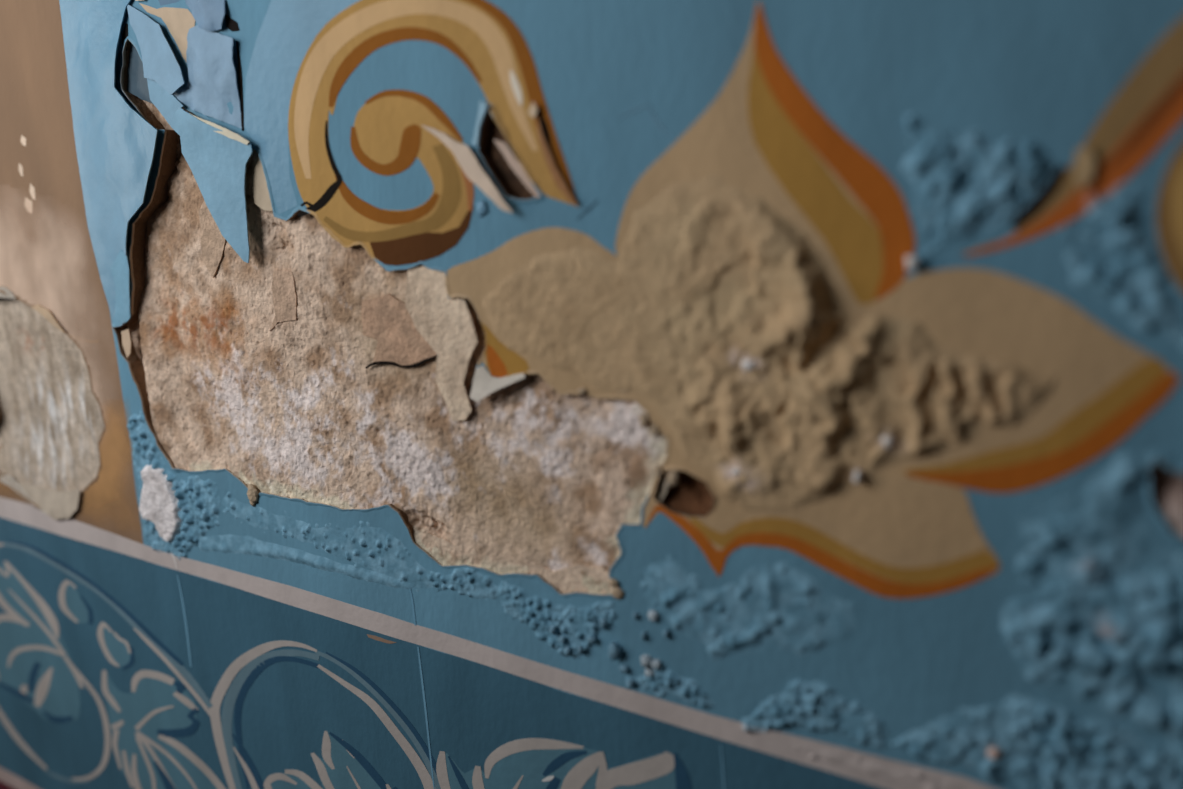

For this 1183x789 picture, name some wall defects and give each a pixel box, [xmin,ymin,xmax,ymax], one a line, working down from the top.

peeling [0,286,107,521]
flaking render [110,0,718,600]
flaking render [1142,446,1183,545]